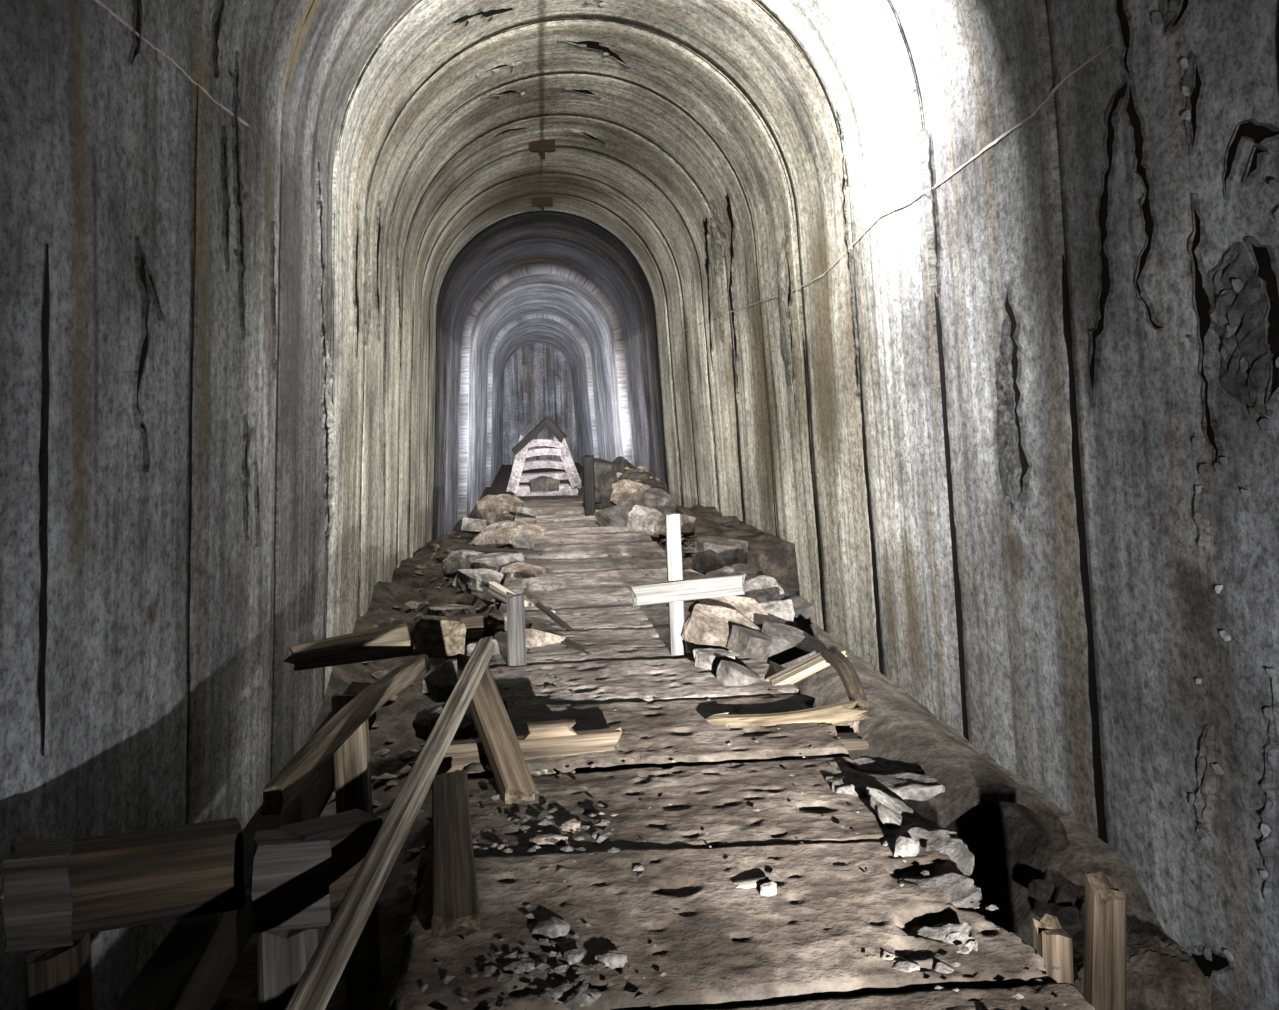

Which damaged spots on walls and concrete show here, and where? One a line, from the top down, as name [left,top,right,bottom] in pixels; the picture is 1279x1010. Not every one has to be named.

crack [94,0,251,128]
spalling [1152,0,1194,38]
crack [132,236,166,473]
crack [682,0,1279,479]
spalling [1206,236,1279,433]